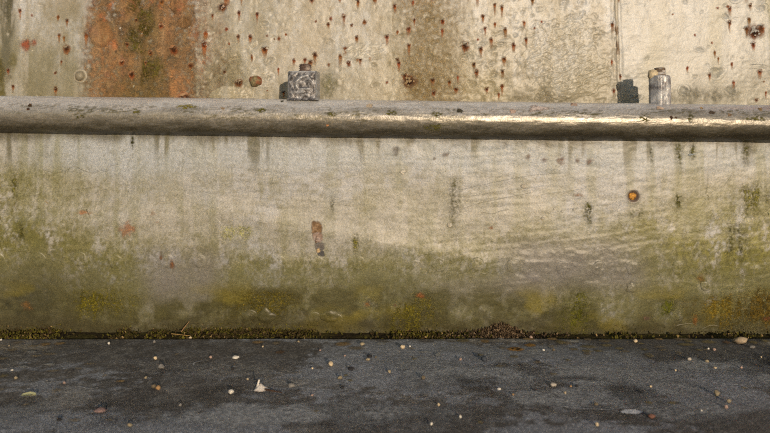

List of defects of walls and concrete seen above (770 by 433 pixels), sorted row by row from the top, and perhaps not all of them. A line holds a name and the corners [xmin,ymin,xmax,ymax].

rust [84,0,205,98]
rust [402,0,456,101]